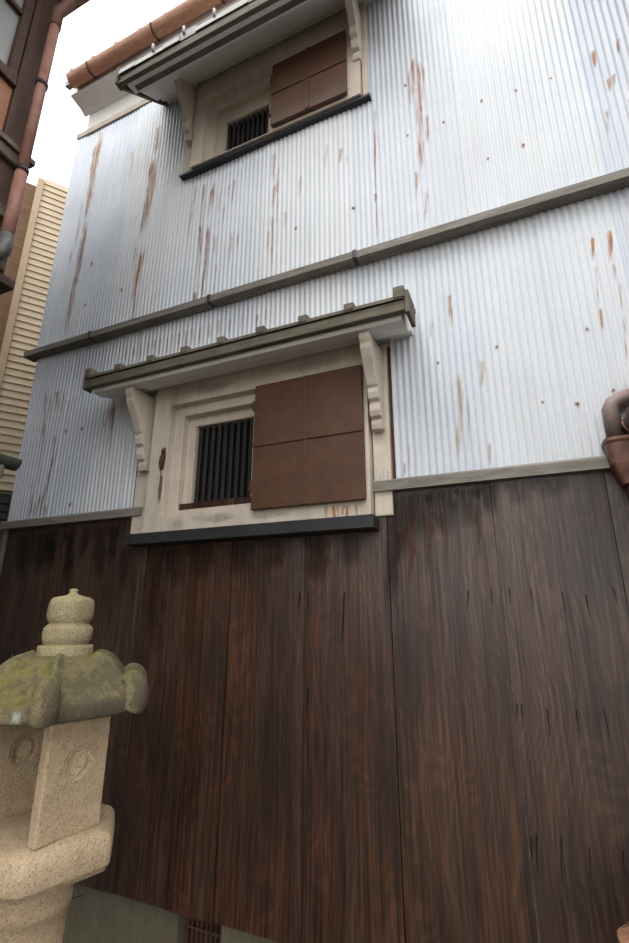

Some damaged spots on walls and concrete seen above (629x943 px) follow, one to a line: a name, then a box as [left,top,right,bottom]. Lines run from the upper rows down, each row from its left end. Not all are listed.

corrosion [68,135,102,318]